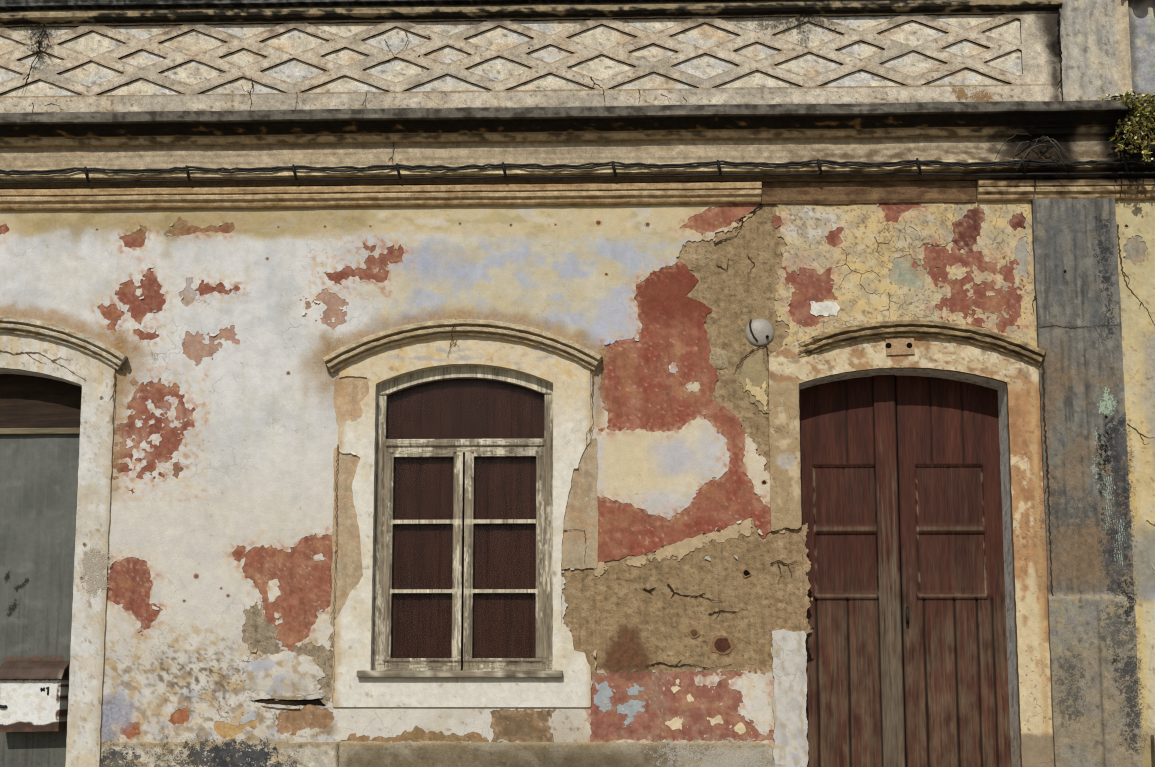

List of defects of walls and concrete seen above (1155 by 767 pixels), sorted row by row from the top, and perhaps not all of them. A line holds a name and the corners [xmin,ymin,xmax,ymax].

peeling [97,264,240,340]
crack [837,226,957,320]
peeling [888,205,1029,333]
damp [1093,214,1117,340]
crack [1117,224,1155,325]
peeling [112,378,196,494]
spalling [561,203,838,742]
peeling [232,447,363,736]
crack [643,584,745,620]
damp [1036,412,1155,753]
crack [646,659,732,669]
damp [99,698,299,767]